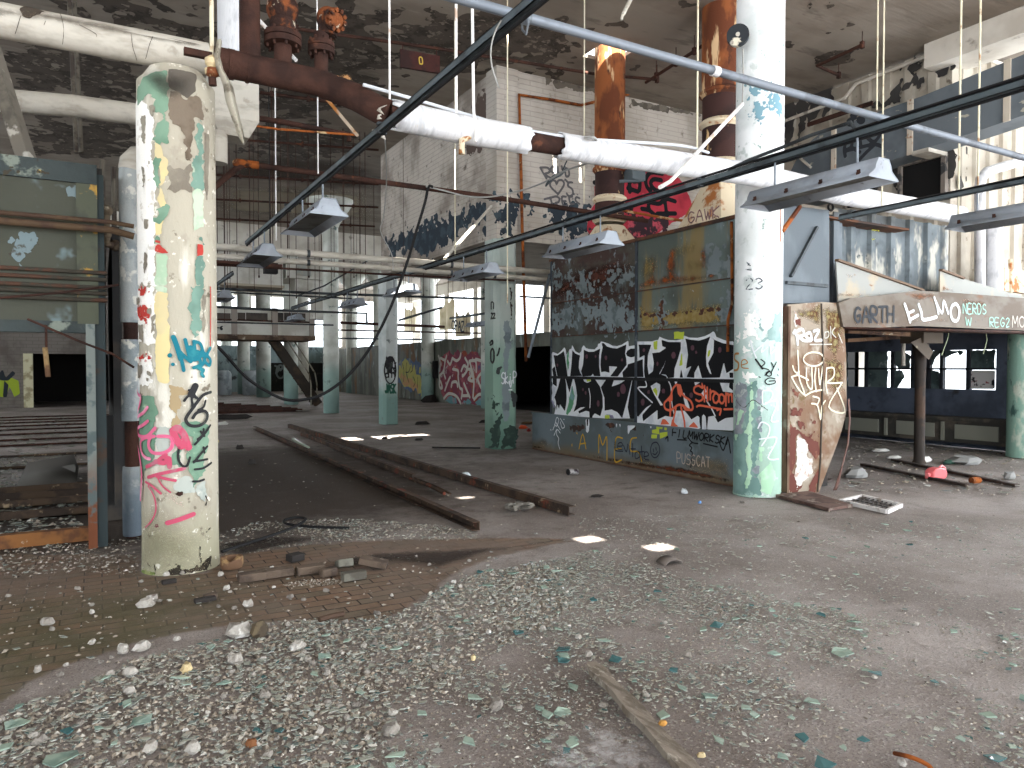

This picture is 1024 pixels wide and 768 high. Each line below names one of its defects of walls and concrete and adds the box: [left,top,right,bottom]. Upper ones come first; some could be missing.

peeling [49,0,217,46]
peeling [328,0,503,99]
peeling [461,16,595,93]
peeling [233,85,371,161]
peeling [744,81,834,144]
peeling [385,181,592,260]
peeling [4,42,210,501]
corrosion [556,265,628,295]
corrosion [639,251,721,331]
peeling [488,321,519,449]
peeling [733,371,776,498]
peeling [789,388,820,493]